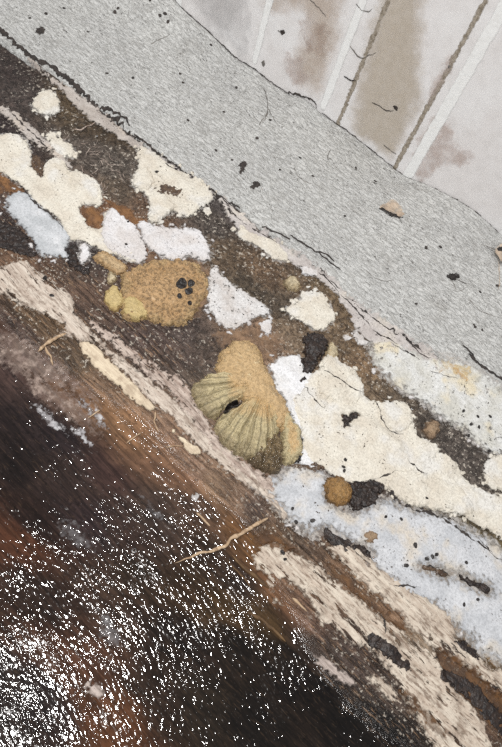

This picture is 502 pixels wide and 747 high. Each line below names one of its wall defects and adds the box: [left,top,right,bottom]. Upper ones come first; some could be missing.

water stain [290,0,334,83]
water stain [356,0,419,152]
spalling [379,200,404,223]
crack [462,345,502,380]
peeling [79,320,274,492]
peeling [327,544,502,692]
peeling [313,655,354,686]
peeling [365,672,402,708]